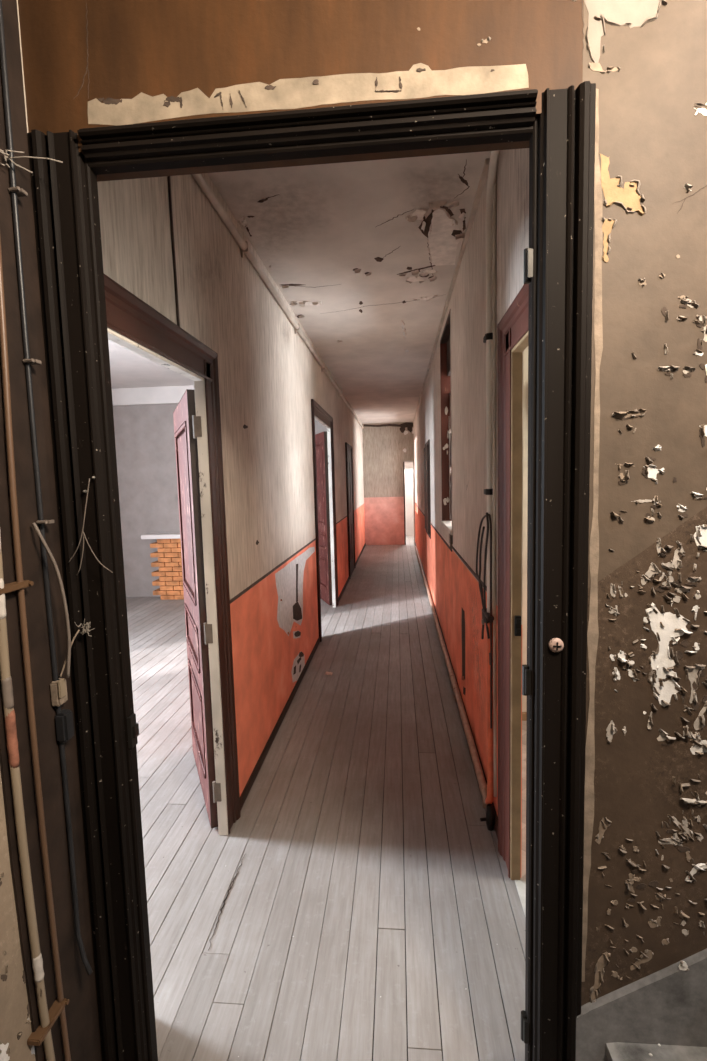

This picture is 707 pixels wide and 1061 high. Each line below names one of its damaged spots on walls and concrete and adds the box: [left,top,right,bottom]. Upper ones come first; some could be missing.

spalling [572,0,668,74]
spalling [88,63,529,126]
peeling [397,200,466,283]
peeling [582,89,707,1003]
peeling [275,547,315,639]
peeling [291,652,305,682]
peeling [32,953,44,983]
peeling [0,1017,31,1061]